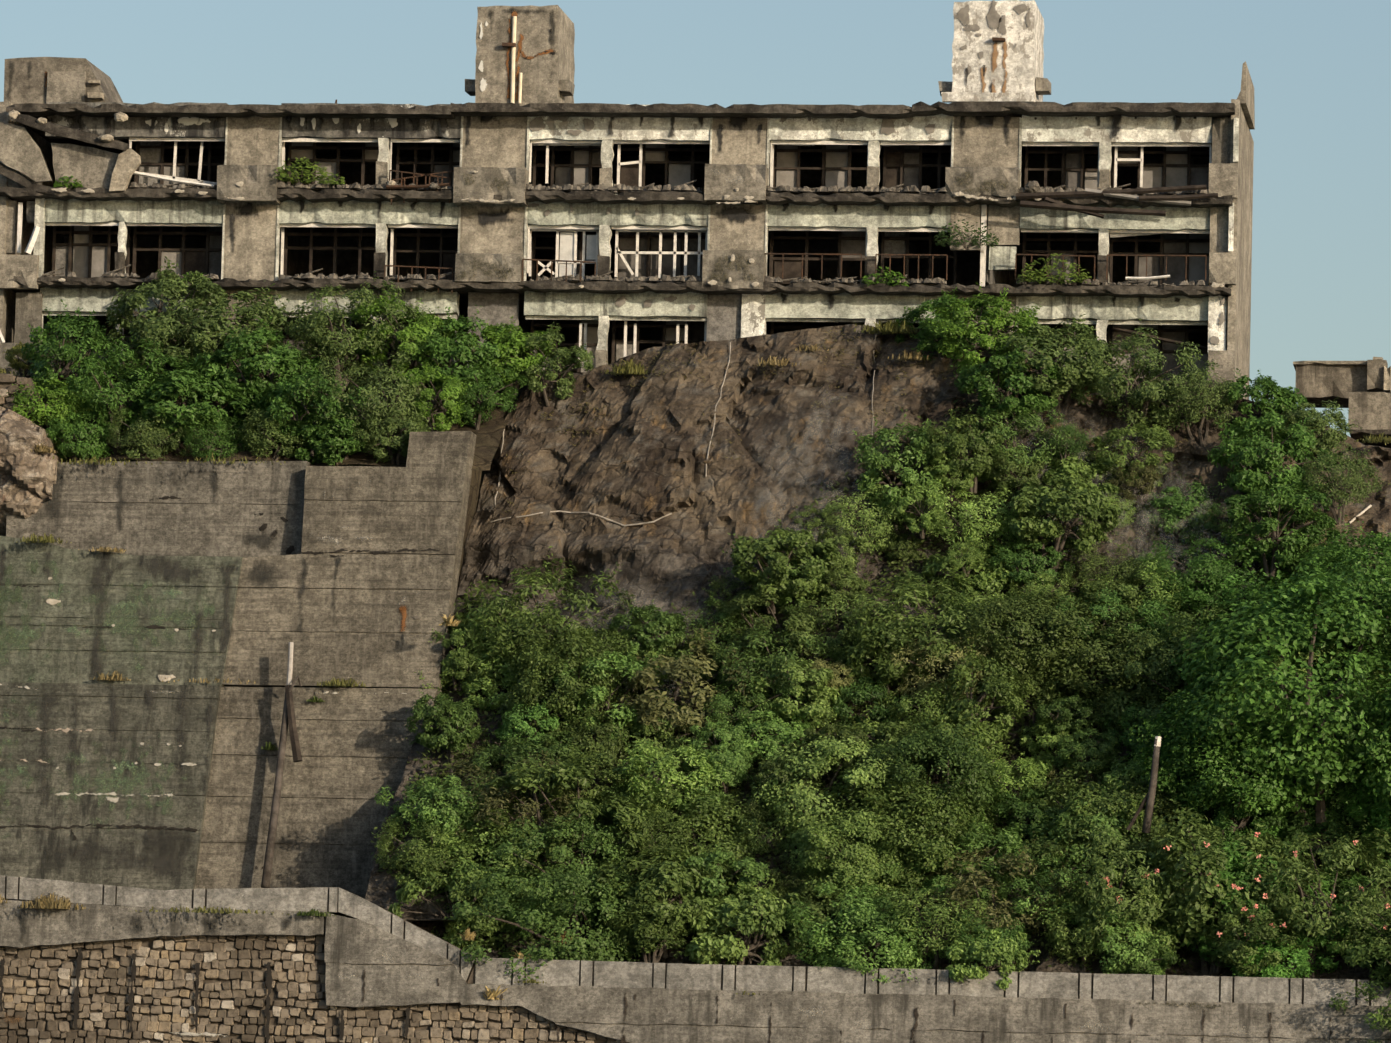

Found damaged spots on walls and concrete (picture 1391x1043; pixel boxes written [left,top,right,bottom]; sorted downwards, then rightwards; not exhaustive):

corrosion [506,11,553,100]
peeling [954,0,1031,75]
corrosion [981,41,1008,93]
peeling [145,117,211,133]
damp [48,472,62,522]
damp [116,472,125,529]
damp [140,556,199,581]
damp [247,534,274,585]
damp [92,554,122,675]
damp [220,566,232,651]
damp [20,686,173,803]
damp [167,691,208,768]